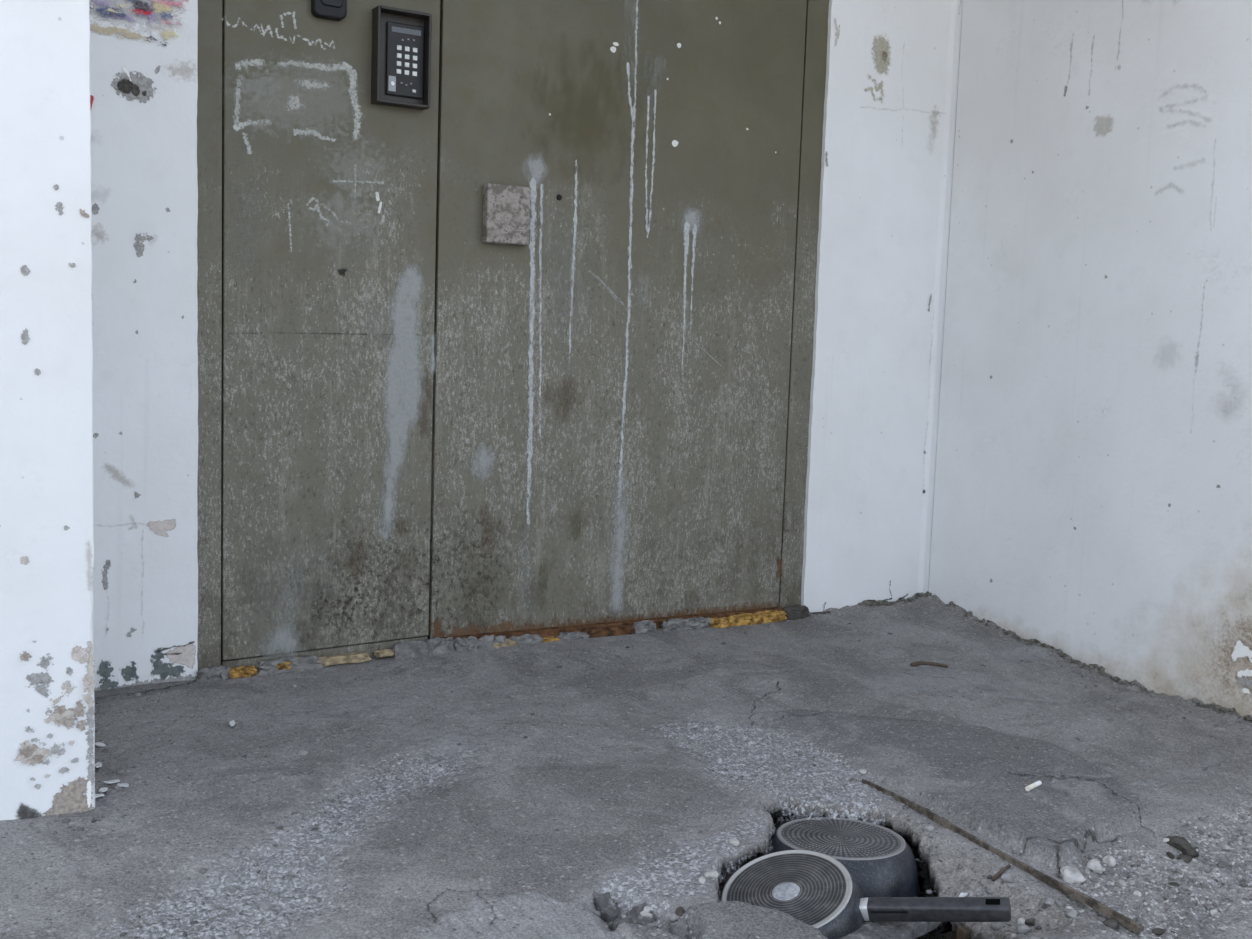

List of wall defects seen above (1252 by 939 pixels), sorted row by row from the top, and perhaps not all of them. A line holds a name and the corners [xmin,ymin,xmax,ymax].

rust [434,603,782,638]
peeling [1231,640,1252,694]
peeling [14,641,196,820]
crack [1009,772,1154,878]